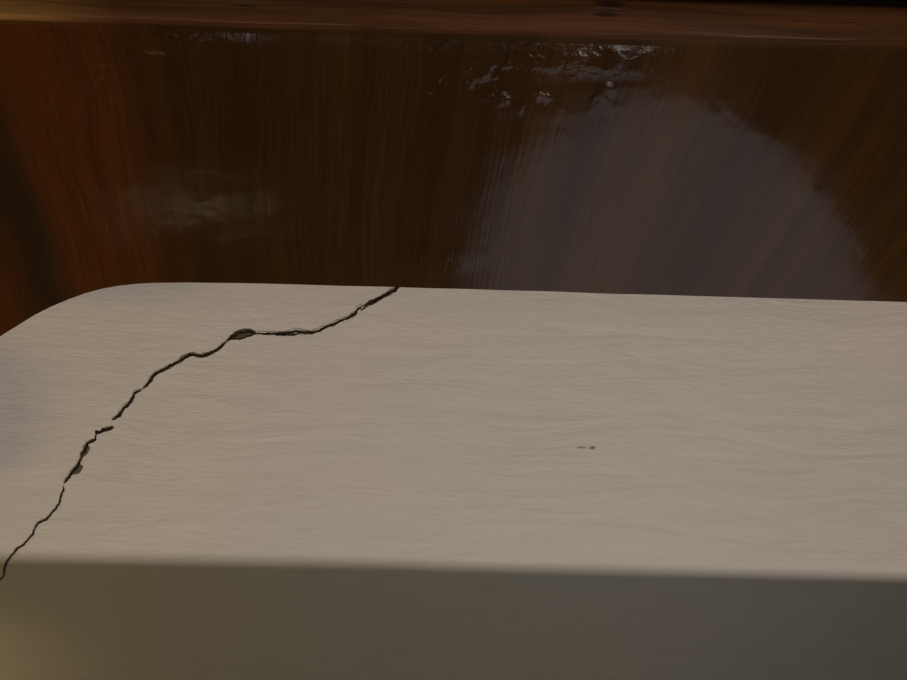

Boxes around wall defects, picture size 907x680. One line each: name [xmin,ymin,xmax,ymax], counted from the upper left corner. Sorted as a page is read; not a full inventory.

crack [0,287,404,580]